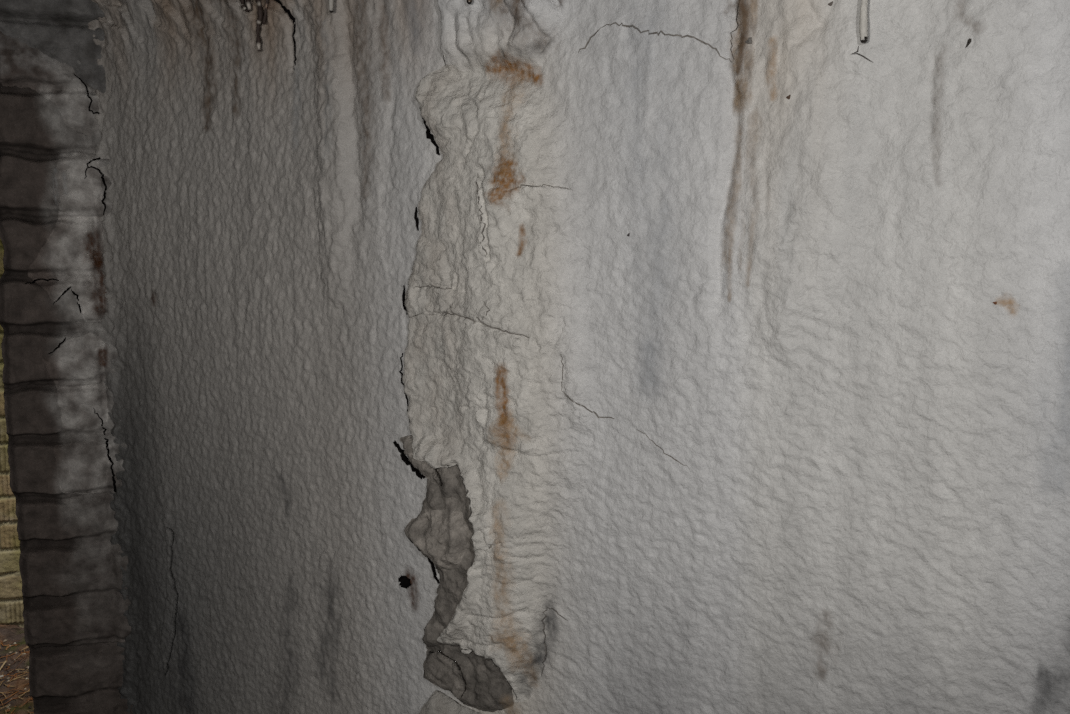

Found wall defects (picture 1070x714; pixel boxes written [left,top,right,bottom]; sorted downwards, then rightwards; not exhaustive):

corrosion [487,57,540,82]
crack [578,0,740,63]
leakage [734,0,757,107]
crack [74,74,99,114]
crack [419,107,440,155]
crack [84,157,107,215]
corrosion [490,161,514,201]
crack [412,207,420,231]
crack [25,278,81,313]
peeling [400,64,600,714]
corrosion [496,370,509,450]